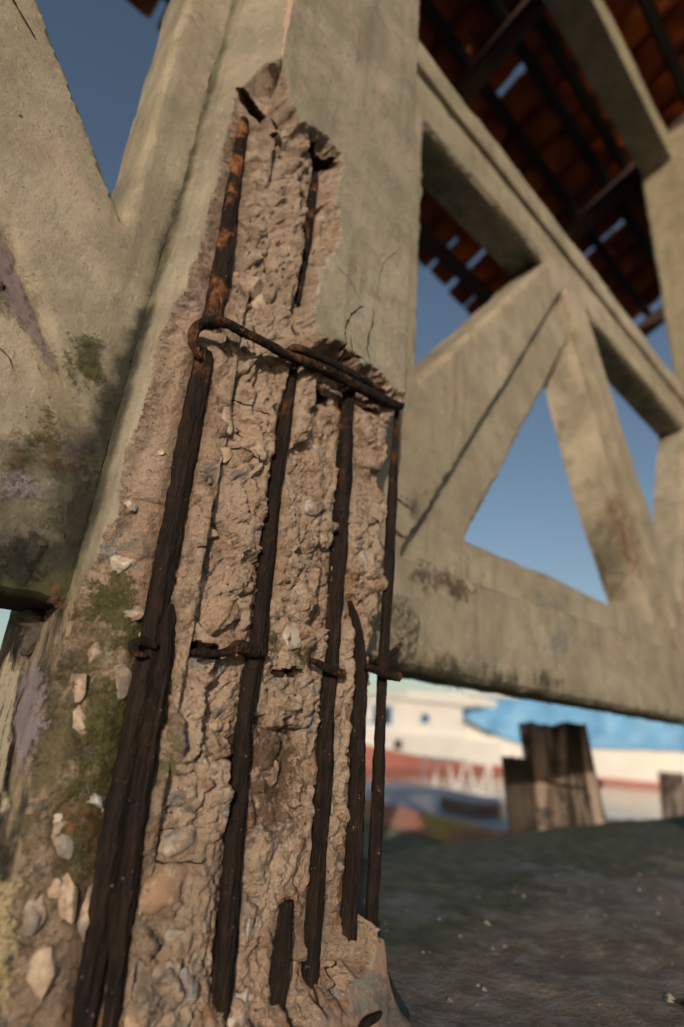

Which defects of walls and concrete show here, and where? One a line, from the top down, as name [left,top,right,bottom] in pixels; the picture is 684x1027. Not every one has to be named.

crack [13,0,35,37]
crack [336,248,400,366]
spalling [0,0,405,1027]
damp [0,652,27,1009]